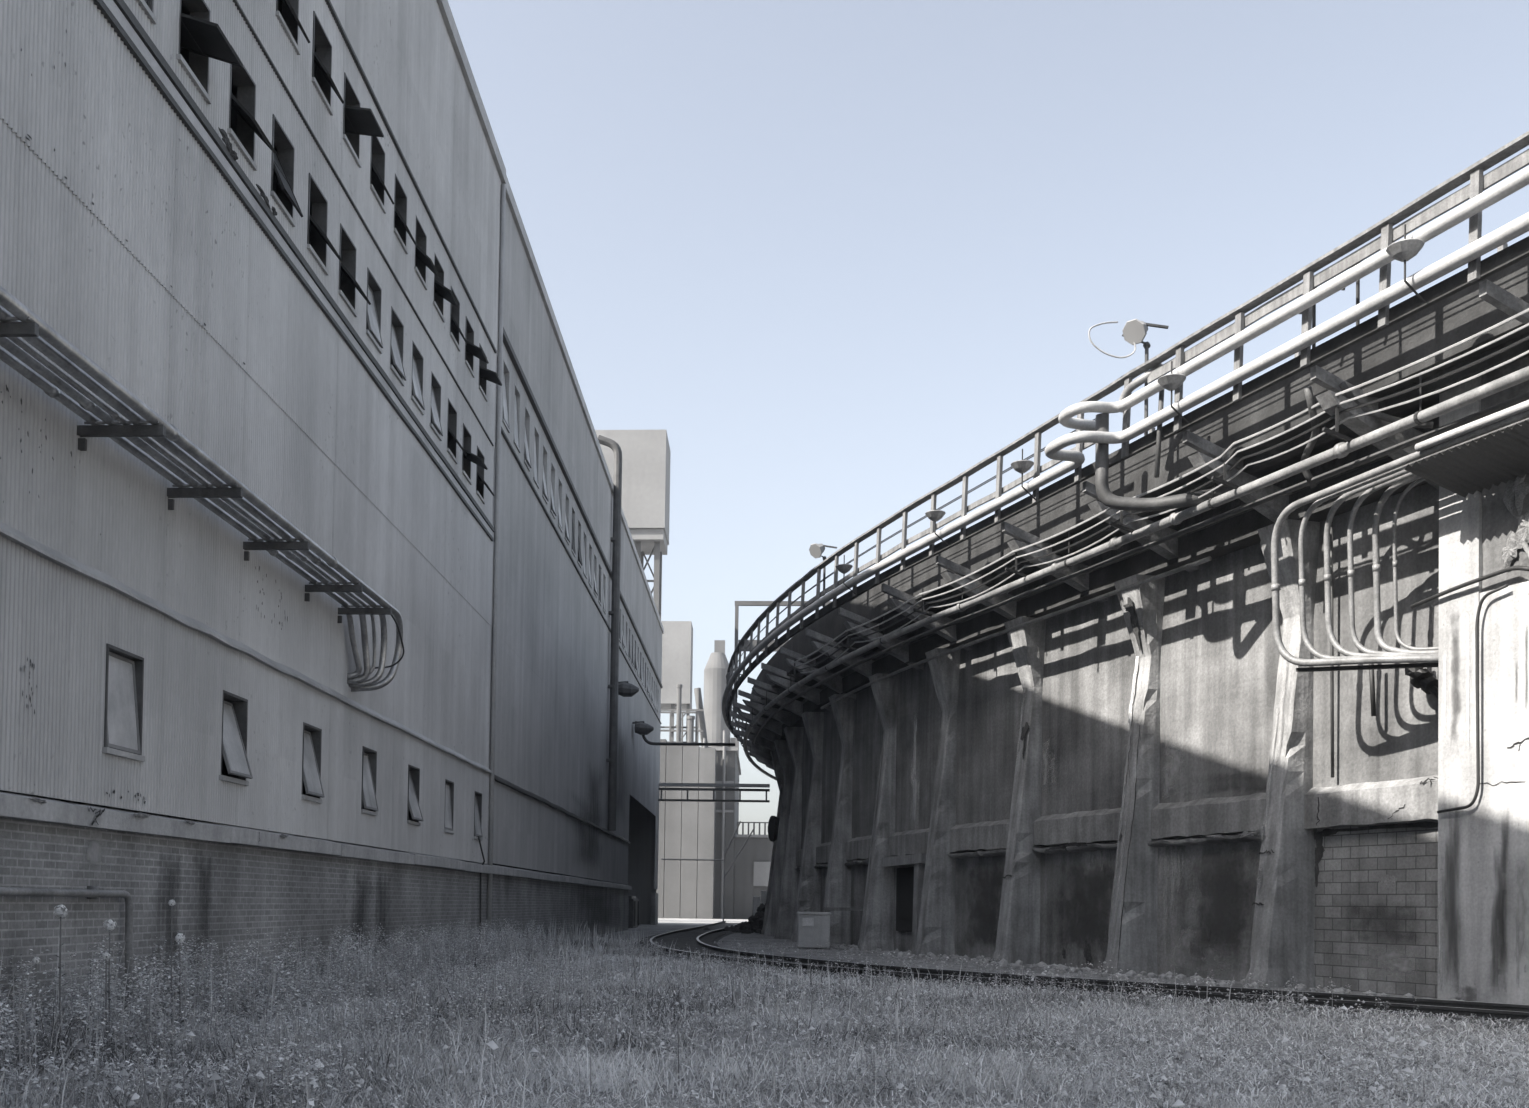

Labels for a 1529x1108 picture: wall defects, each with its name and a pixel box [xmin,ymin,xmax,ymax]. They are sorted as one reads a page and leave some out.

leakage [1493,833,1524,985]